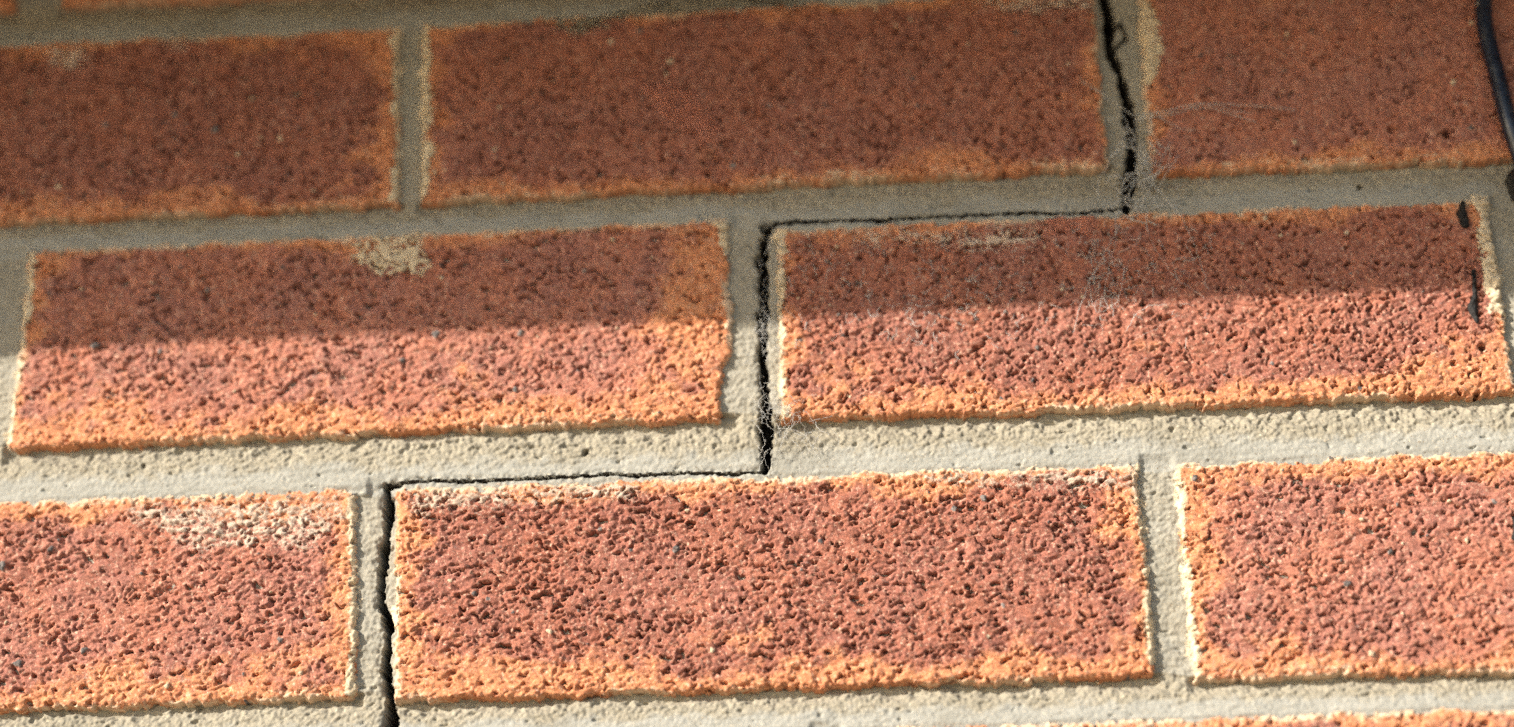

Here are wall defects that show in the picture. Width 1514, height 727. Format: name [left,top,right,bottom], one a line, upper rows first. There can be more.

crack [379,0,1138,727]